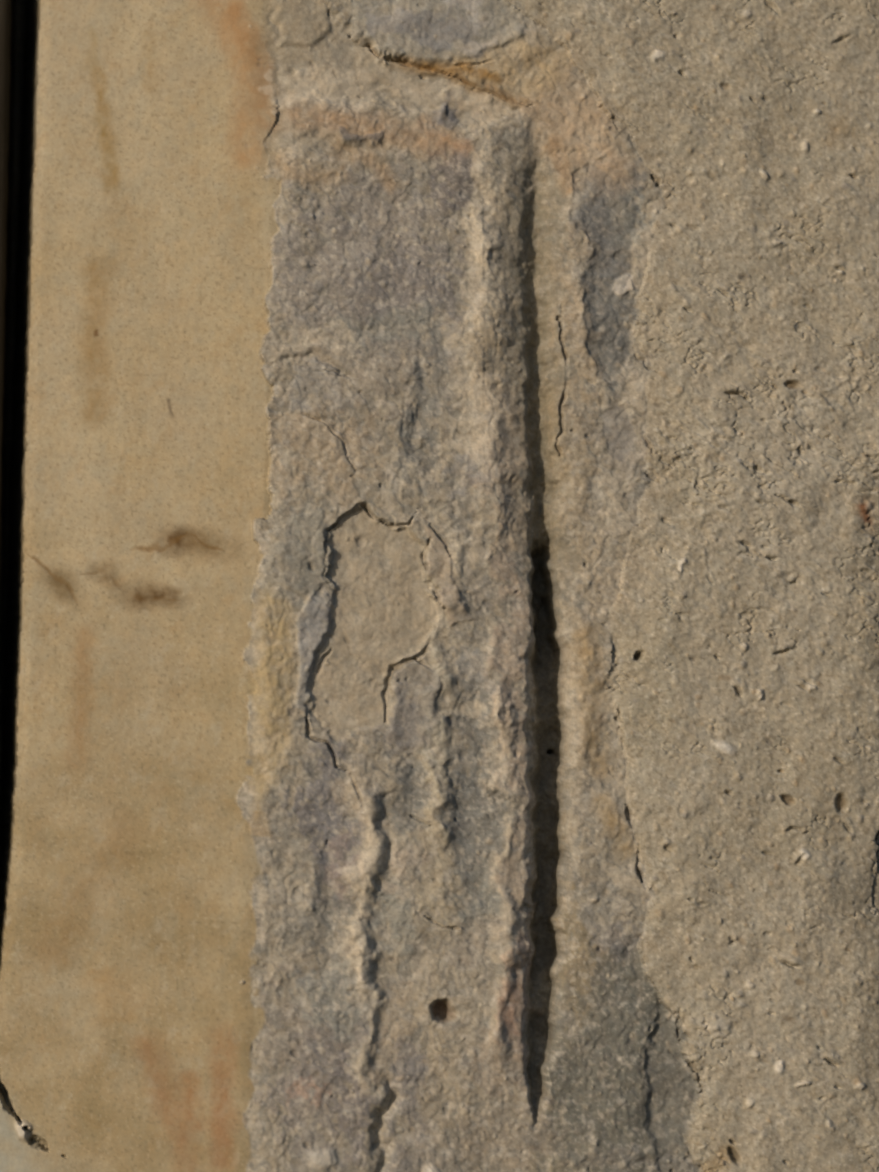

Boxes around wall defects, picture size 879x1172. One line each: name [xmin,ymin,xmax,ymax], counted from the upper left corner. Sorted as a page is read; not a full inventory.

corrosion [272,102,477,198]
spalling [261,0,531,146]
crack [319,0,535,108]
crack [604,103,624,137]
crack [650,172,663,188]
peeling [567,161,650,465]
crack [553,297,570,490]
spalling [264,501,476,760]
spalling [632,649,647,662]
spalling [427,997,460,1026]
peeling [13,1116,34,1144]
spalling [642,990,708,1172]